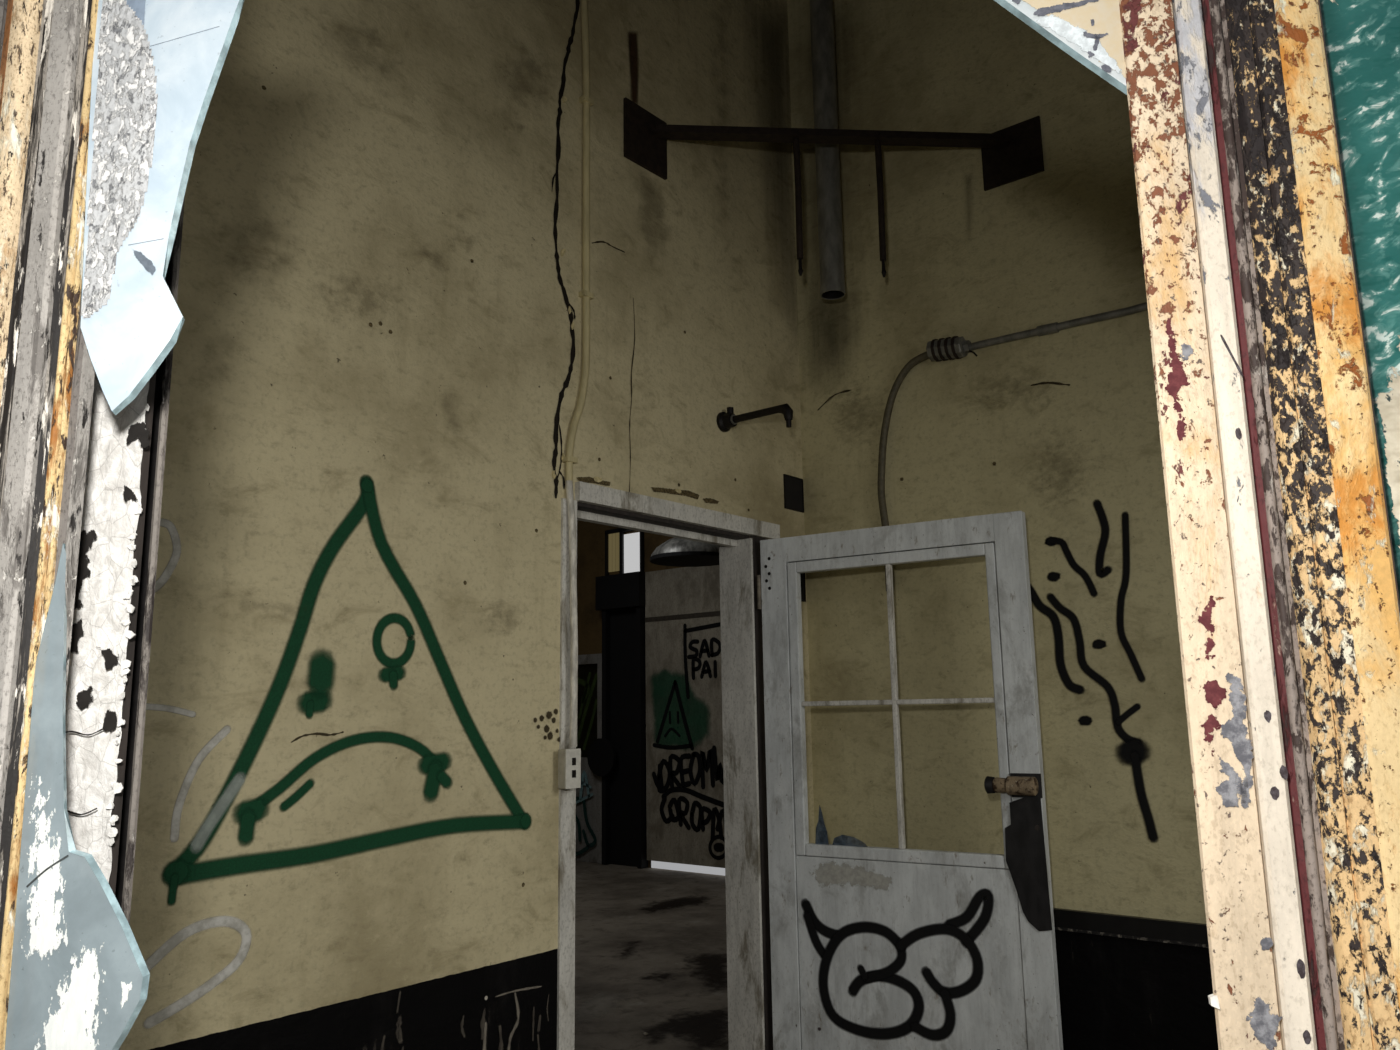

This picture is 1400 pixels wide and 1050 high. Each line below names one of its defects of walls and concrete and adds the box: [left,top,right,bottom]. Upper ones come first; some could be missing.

crack [552,0,625,498]
peeling [1165,318,1196,441]
spalling [1220,335,1243,377]
peeling [1198,595,1216,660]
peeling [1201,673,1254,809]
spalling [1270,765,1288,800]
peeling [1260,937,1273,950]
spalling [1297,959,1306,979]
flaking render [1208,994,1220,1009]
peeling [1246,997,1282,1050]